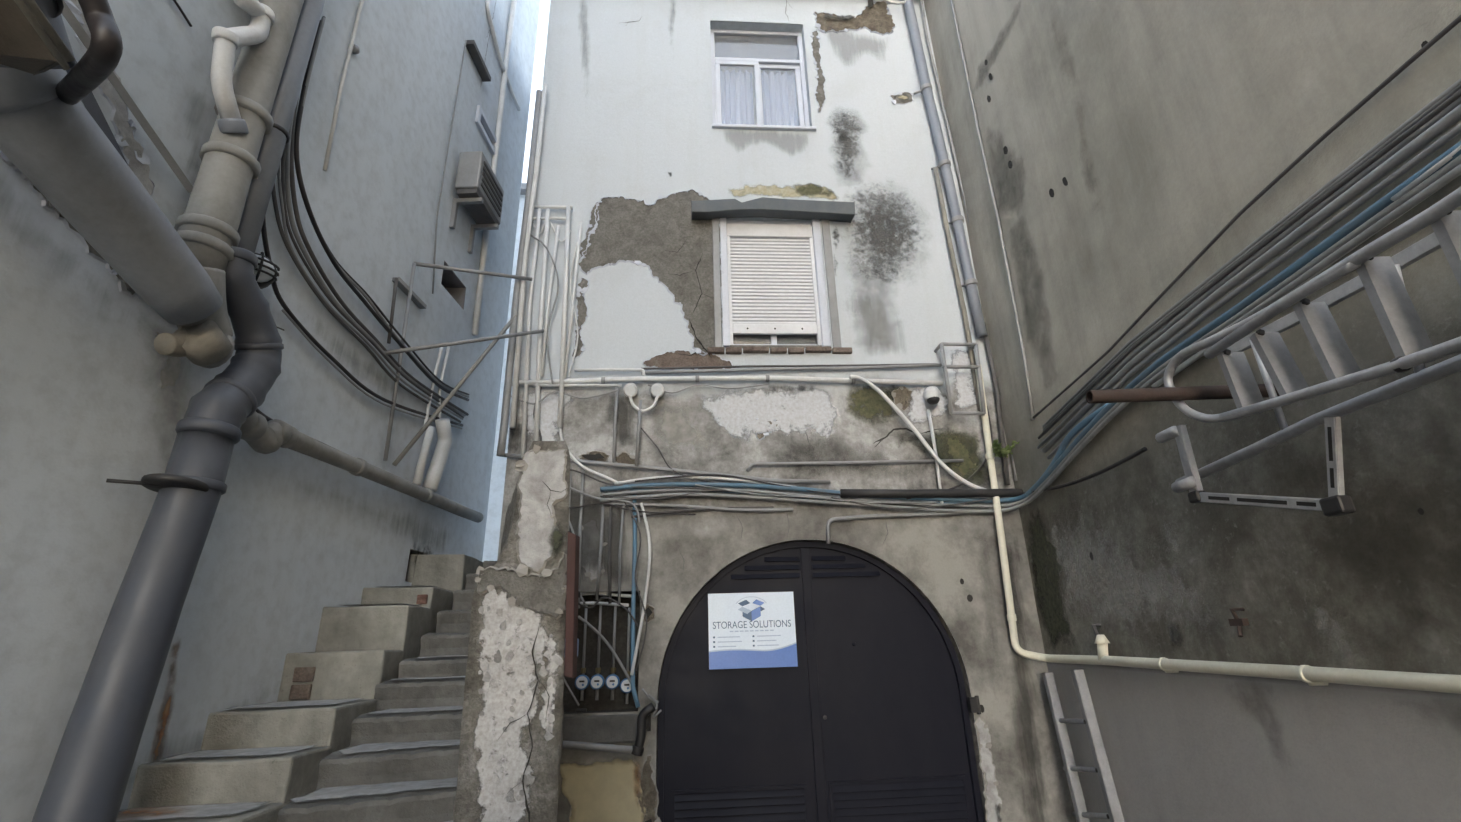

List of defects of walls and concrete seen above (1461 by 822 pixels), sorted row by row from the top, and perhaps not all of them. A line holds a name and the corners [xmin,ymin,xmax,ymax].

flaking render [64,0,91,54]
spalling [810,0,896,113]
flaking render [98,66,155,197]
leakage [835,115,859,174]
spalling [889,92,915,105]
flaking render [730,183,837,199]
leakage [833,194,917,274]
flaking render [571,189,733,370]
peeling [474,392,635,822]
rust [153,644,179,762]
peeling [560,754,661,822]